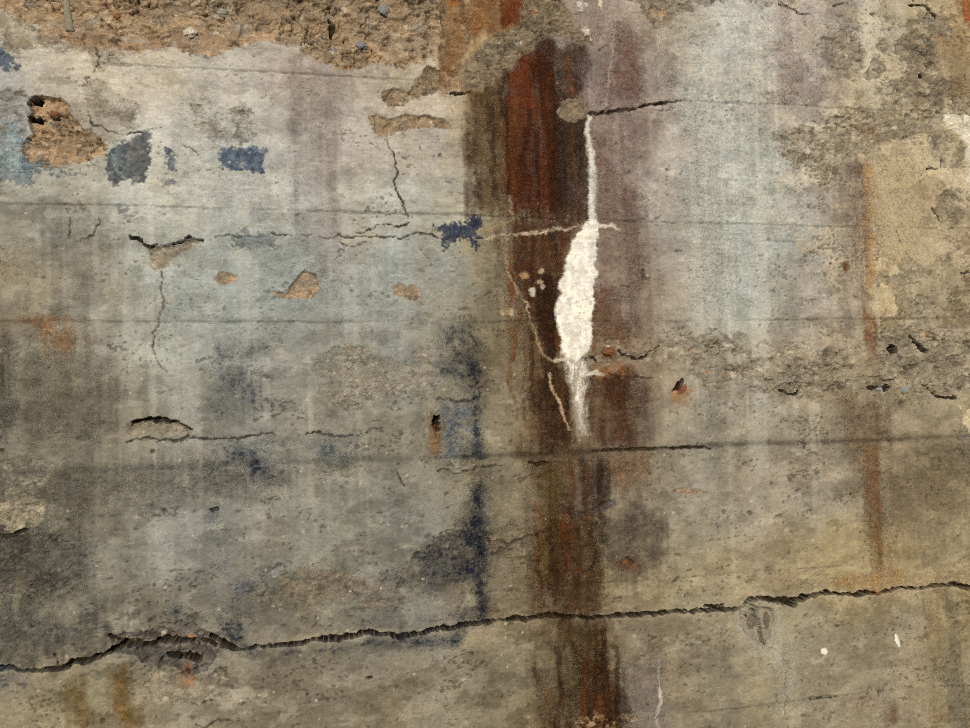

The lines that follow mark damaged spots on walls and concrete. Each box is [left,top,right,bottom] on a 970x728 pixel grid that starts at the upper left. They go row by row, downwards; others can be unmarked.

spalling [0,87,108,170]
spalling [0,0,595,138]
rust [468,0,523,36]
crack [586,99,686,118]
crack [908,0,937,20]
spalling [123,421,193,442]
crack [129,138,463,373]
rust [464,38,629,728]
water stain [546,115,617,417]
rust [584,367,648,446]
spalling [588,233,970,436]
crack [0,581,970,728]